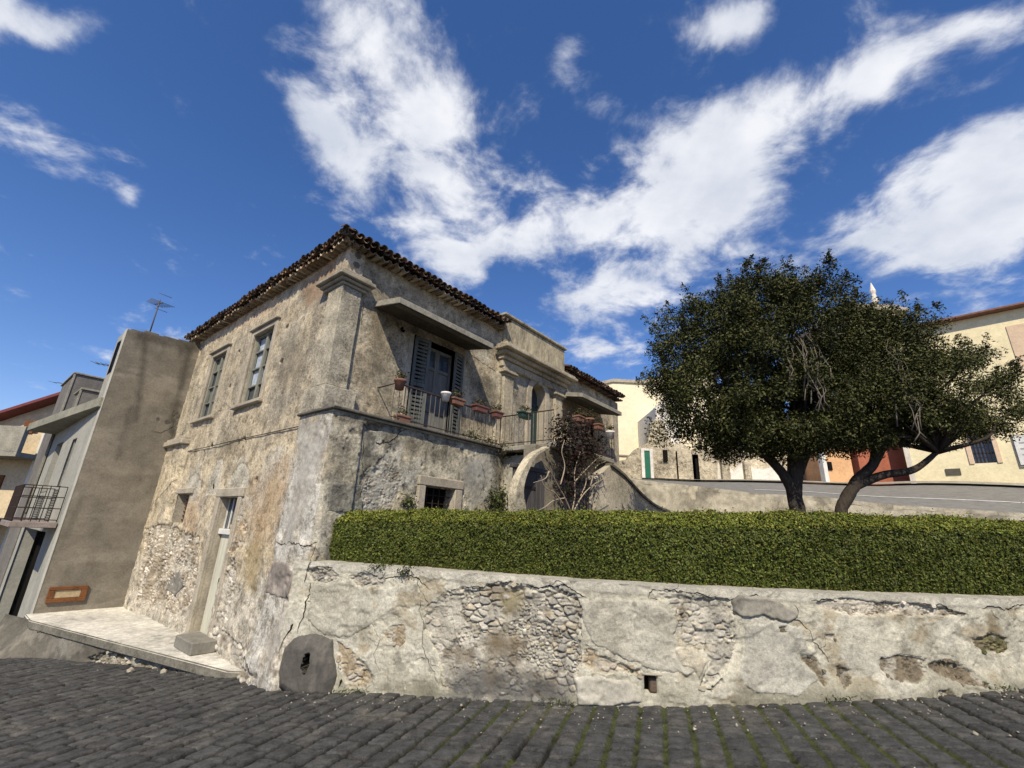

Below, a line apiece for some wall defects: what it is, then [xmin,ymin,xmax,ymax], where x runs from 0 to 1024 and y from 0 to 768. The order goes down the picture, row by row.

spalling [134,523,200,617]
crack [277,541,318,653]
spalling [335,640,374,690]
spalling [424,581,642,704]
spalling [645,590,736,692]
spalling [879,654,990,697]